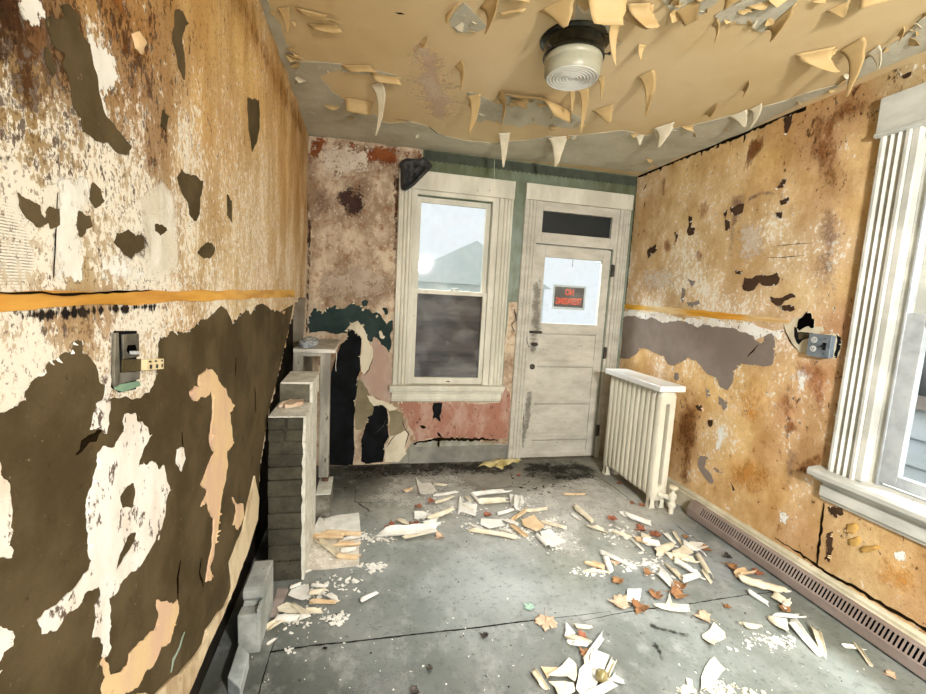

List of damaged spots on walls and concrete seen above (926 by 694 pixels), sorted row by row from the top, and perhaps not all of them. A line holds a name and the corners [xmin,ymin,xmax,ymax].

flaking render [44,4,132,155]
peeling [539,0,660,66]
flaking render [17,193,60,229]
flaking render [114,230,144,258]
flaking render [177,169,203,221]
damp [306,195,395,332]
damp [308,137,422,270]
spalling [307,299,511,465]
peeling [620,293,842,430]
peeling [0,304,293,694]
peeling [266,582,340,645]
crack [775,503,926,632]